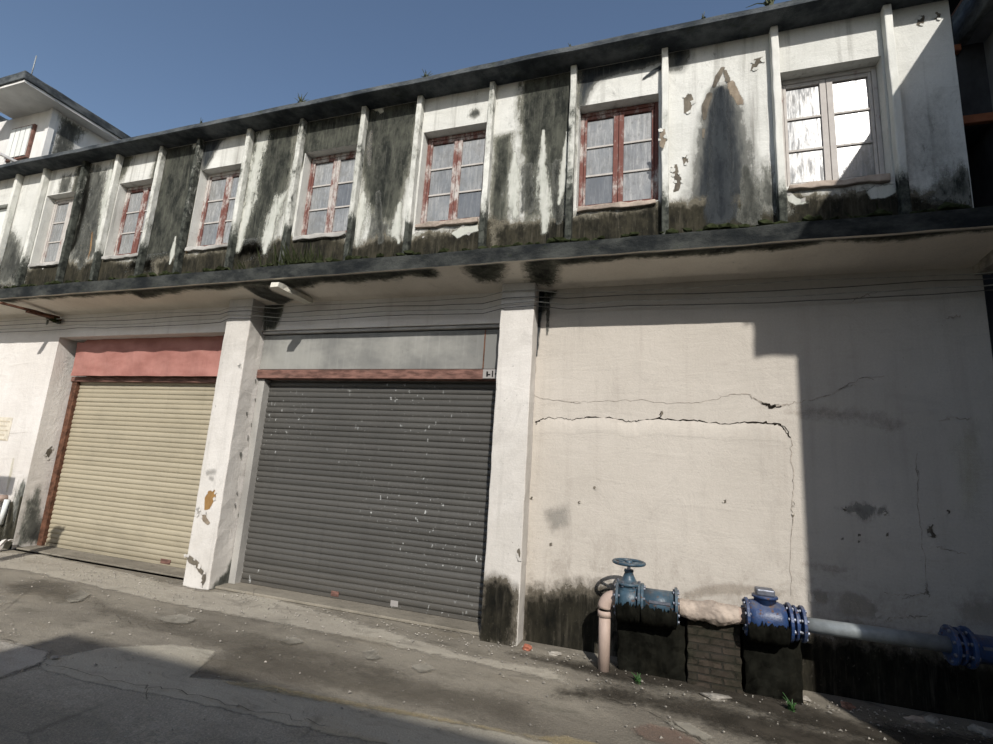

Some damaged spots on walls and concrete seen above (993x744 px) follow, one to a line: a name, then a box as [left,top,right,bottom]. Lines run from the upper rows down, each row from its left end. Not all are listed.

spalling [751,57,766,71]
spalling [915,10,943,26]
water stain [132,138,226,270]
water stain [236,101,417,258]
water stain [489,50,690,234]
spalling [670,154,689,192]
water stain [688,84,790,225]
crack [534,372,883,583]
water stain [531,656,993,744]